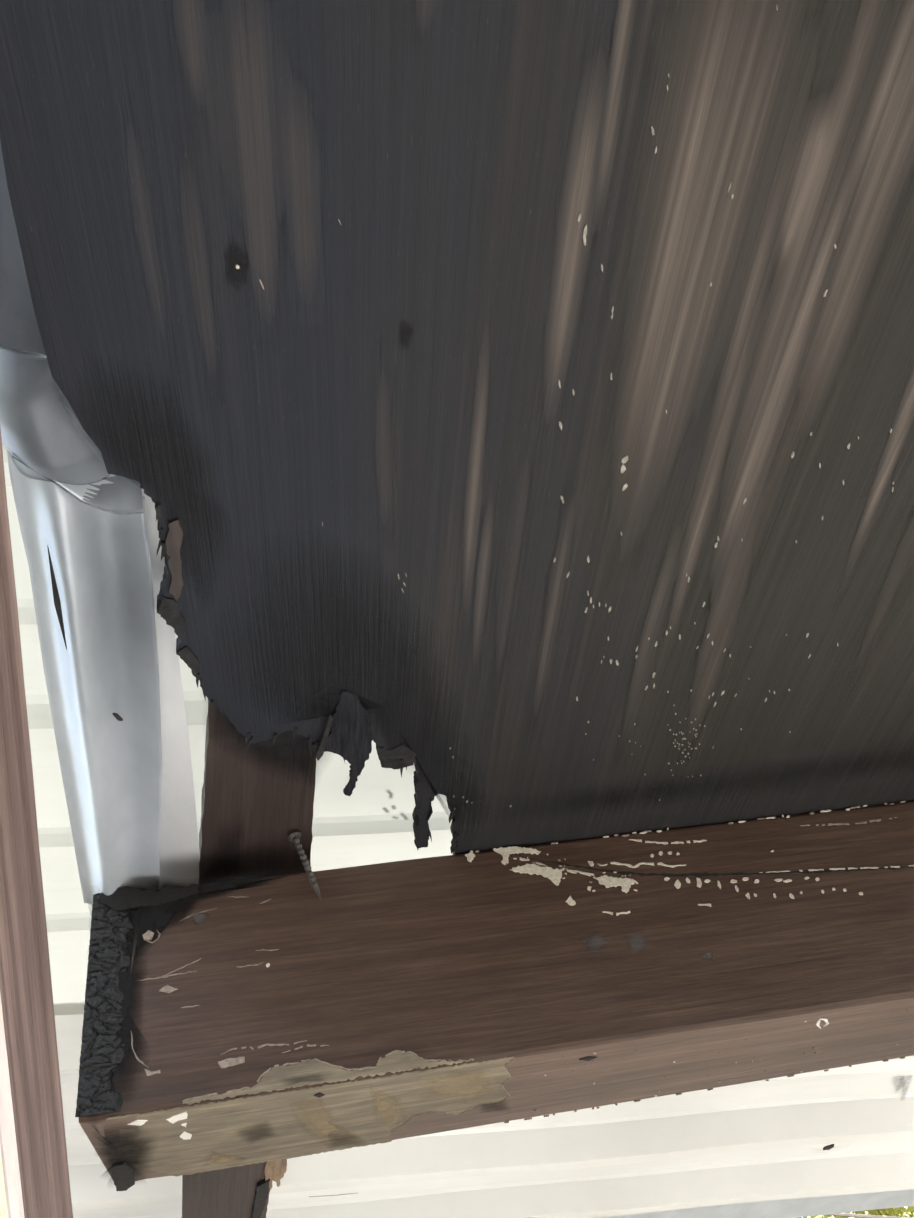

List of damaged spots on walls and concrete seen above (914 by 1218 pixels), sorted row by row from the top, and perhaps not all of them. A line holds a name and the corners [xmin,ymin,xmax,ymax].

peeling [157,595,185,632]
peeling [176,645,200,677]
peeling [376,744,416,770]
peeling [728,801,906,826]
peeling [465,828,759,899]
peeling [773,877,863,899]
peeling [106,1040,514,1177]